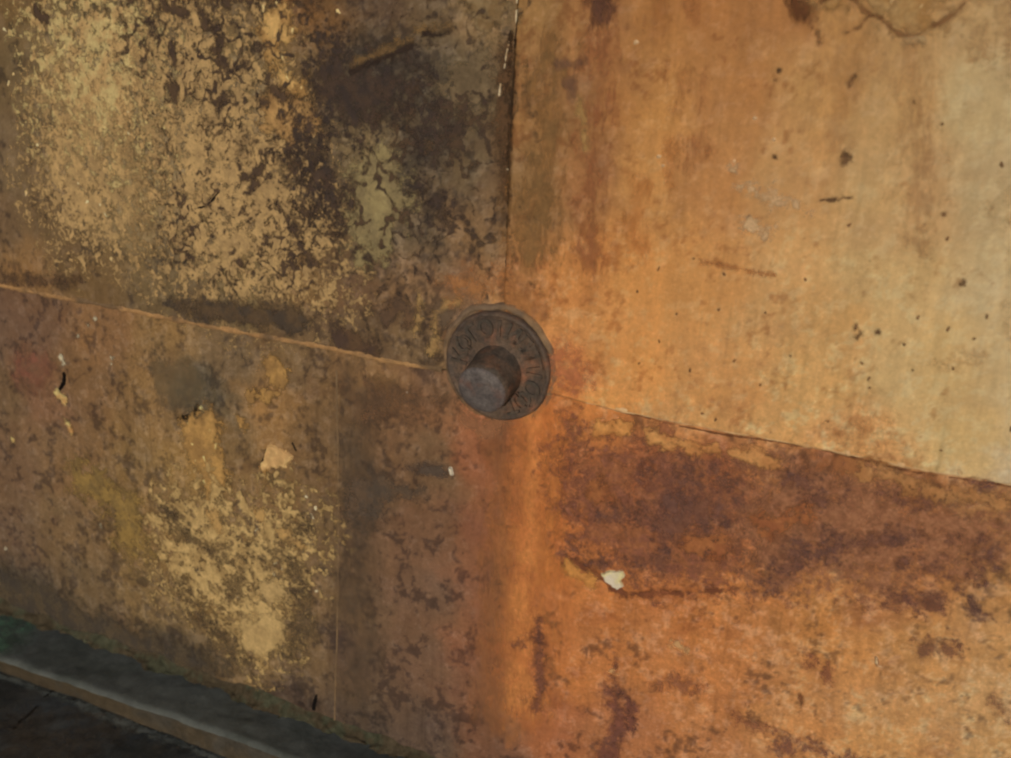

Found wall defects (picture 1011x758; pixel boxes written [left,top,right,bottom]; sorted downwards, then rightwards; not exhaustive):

leakage [33,3,49,25]
leakage [0,266,83,289]
leakage [113,0,538,361]
corrosion [487,400,567,727]